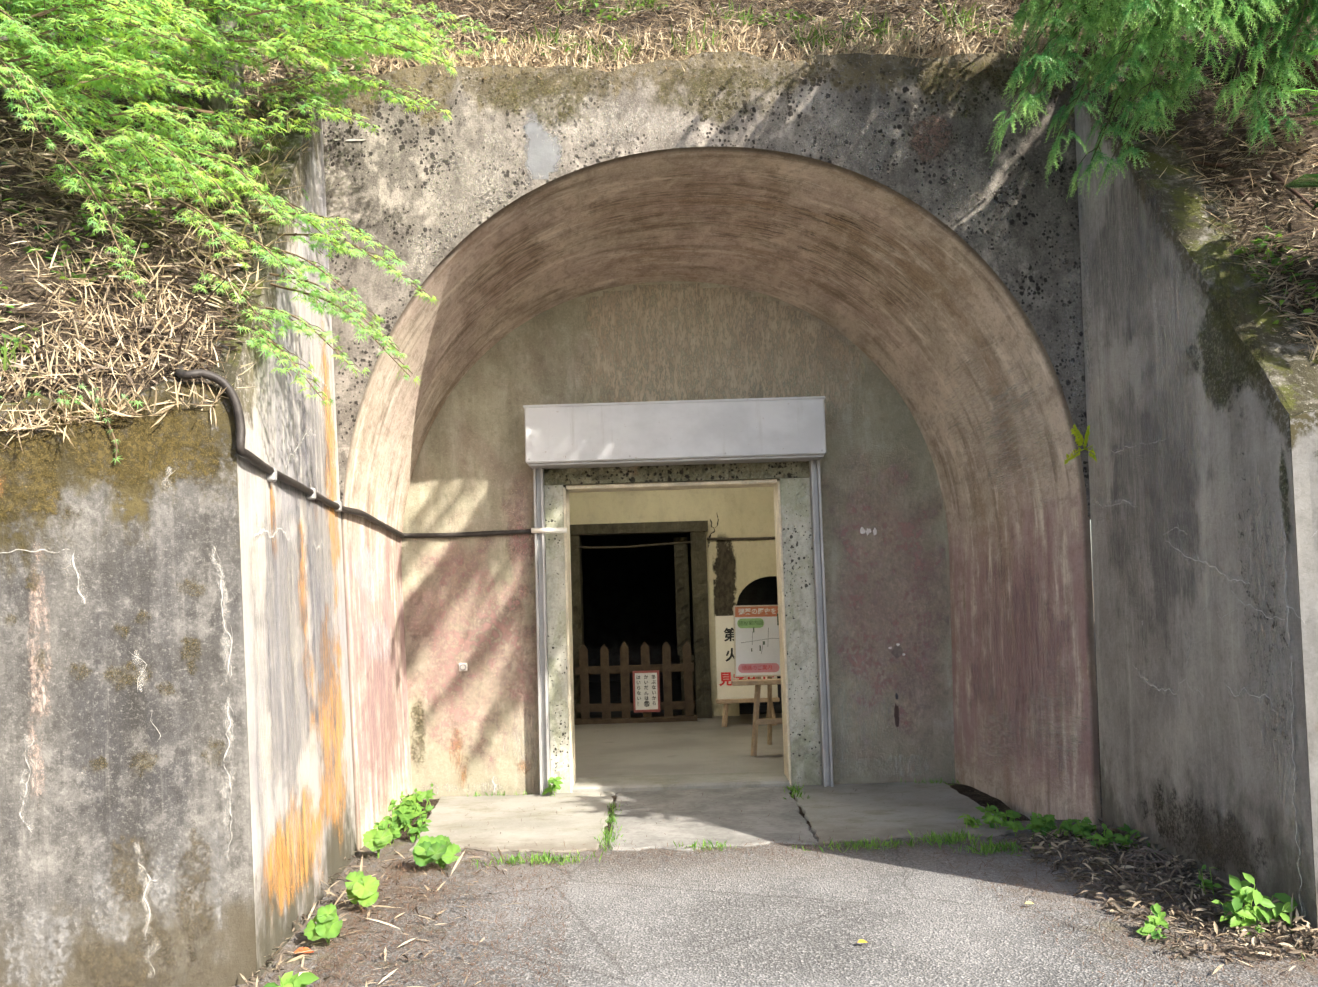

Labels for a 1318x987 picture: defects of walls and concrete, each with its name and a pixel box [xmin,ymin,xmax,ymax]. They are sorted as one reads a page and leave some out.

crack [2,549,85,603]
crack [138,850,162,975]
crack [213,546,234,842]
rust [263,341,347,906]
leakage [1143,784,1265,880]
crack [1133,523,1318,916]